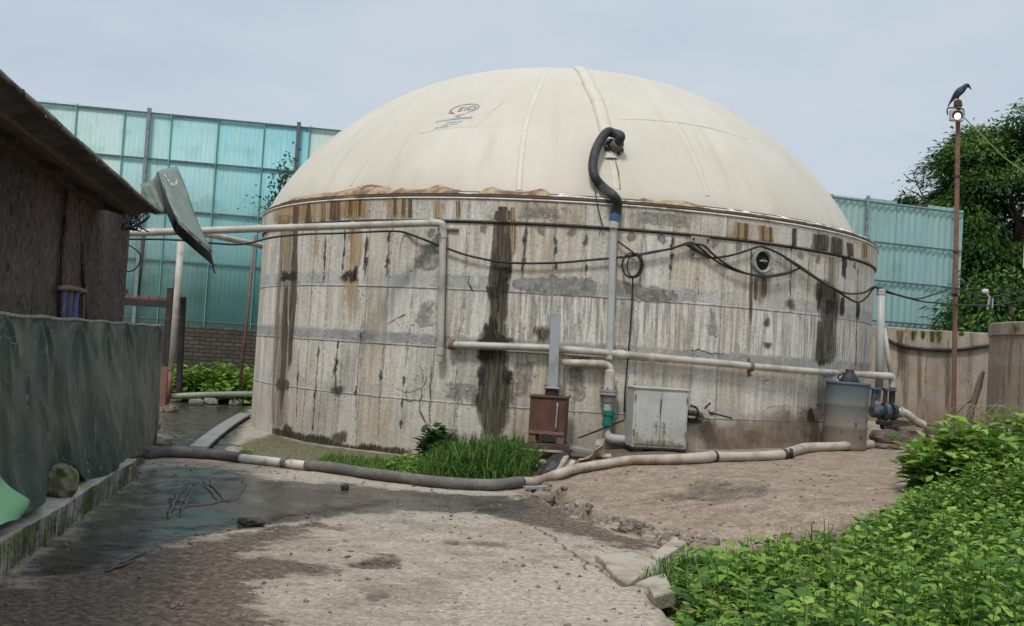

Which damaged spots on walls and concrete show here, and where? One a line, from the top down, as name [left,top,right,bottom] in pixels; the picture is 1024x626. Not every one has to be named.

damp [271,215,298,437]
rust [274,195,366,314]
crack [296,295,463,434]
damp [468,206,514,439]
rust [733,222,773,322]
damp [814,234,860,365]
damp [332,431,346,443]